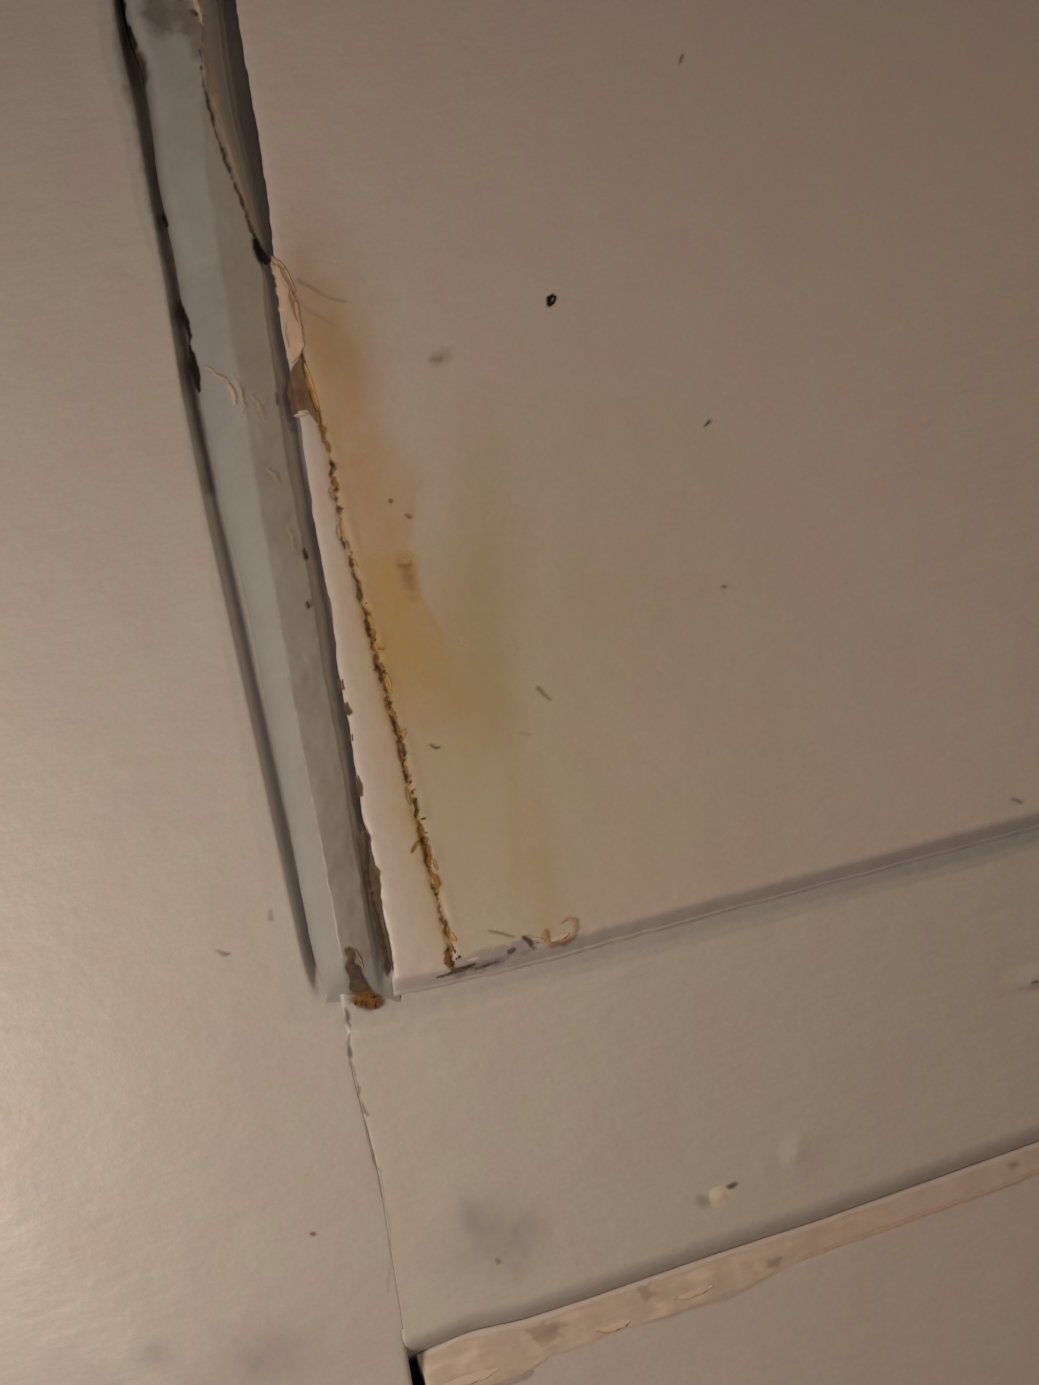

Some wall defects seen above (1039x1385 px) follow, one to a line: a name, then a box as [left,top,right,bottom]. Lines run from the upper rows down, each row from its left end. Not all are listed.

peeling [271,256,322,424]
peeling [344,947,369,993]
peeling [360,824,392,977]
crack [345,1013,365,1112]